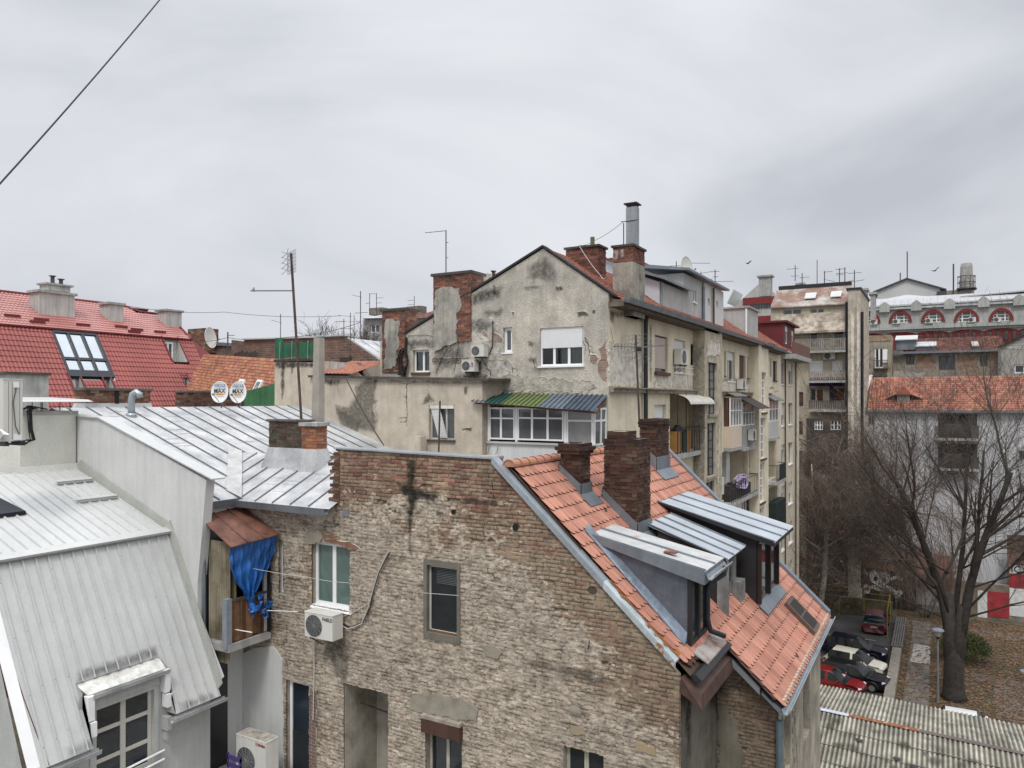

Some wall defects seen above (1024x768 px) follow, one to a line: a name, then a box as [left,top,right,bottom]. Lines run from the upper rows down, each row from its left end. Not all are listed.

damp [337,381,376,431]
peeling [474,311,721,484]
damp [399,459,436,528]